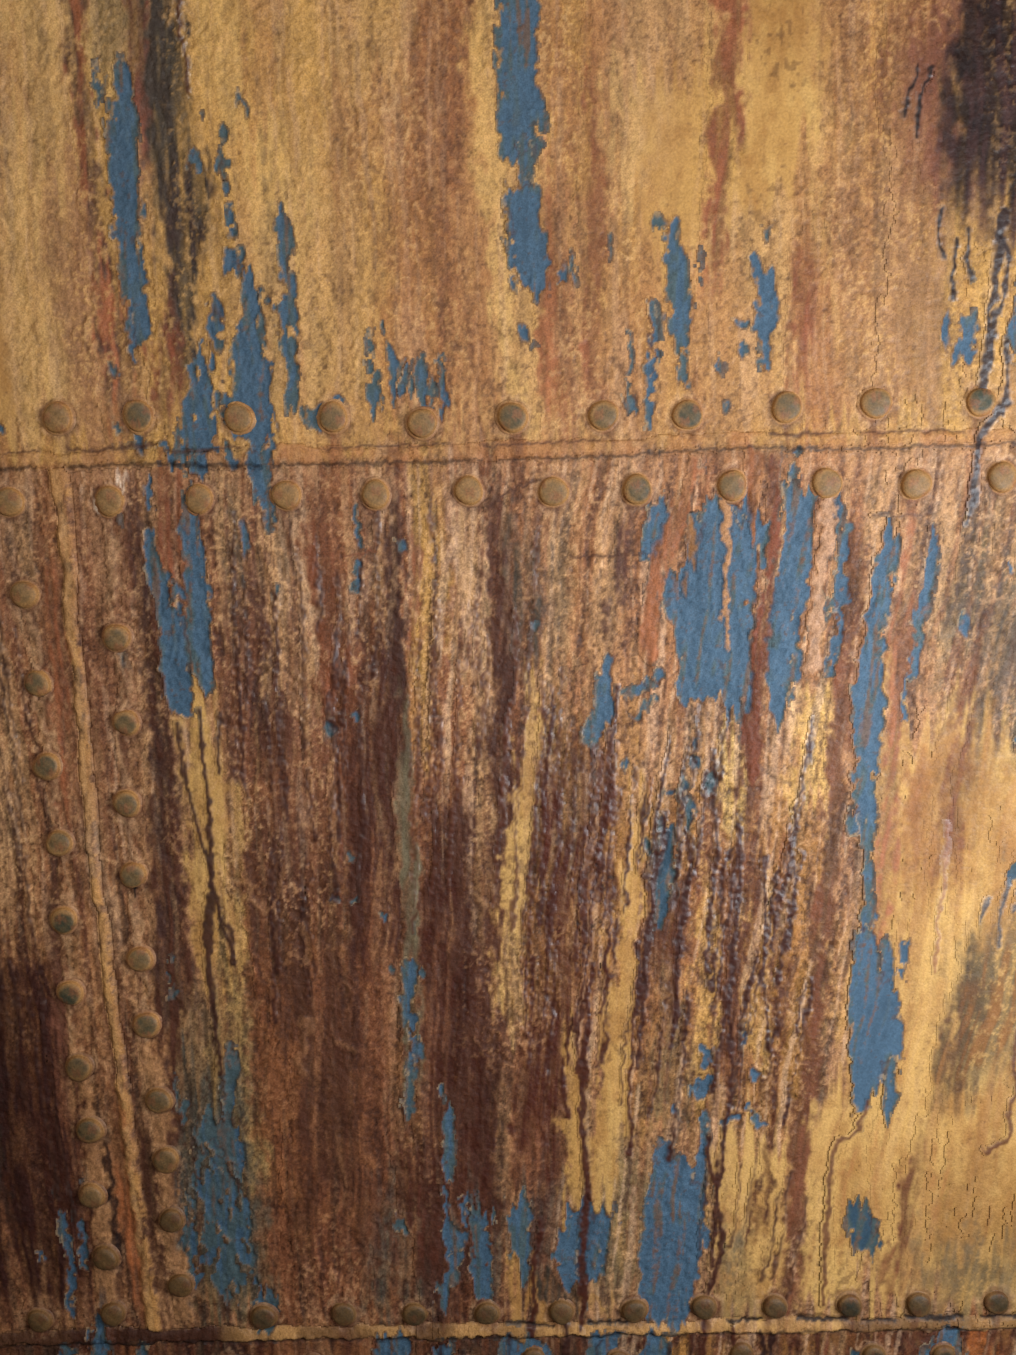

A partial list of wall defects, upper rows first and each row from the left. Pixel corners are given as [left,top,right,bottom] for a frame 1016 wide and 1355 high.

peeling [89,51,155,379]
rust [57,0,229,461]
peeling [111,109,349,719]
peeling [492,0,581,306]
peeling [619,211,707,431]
rust [688,0,755,332]
water stain [866,0,1016,771]
rust [0,493,100,1354]
rust [113,431,971,1355]
peeling [637,1043,769,1355]
peeling [582,444,942,1128]
rust [871,451,1016,1087]